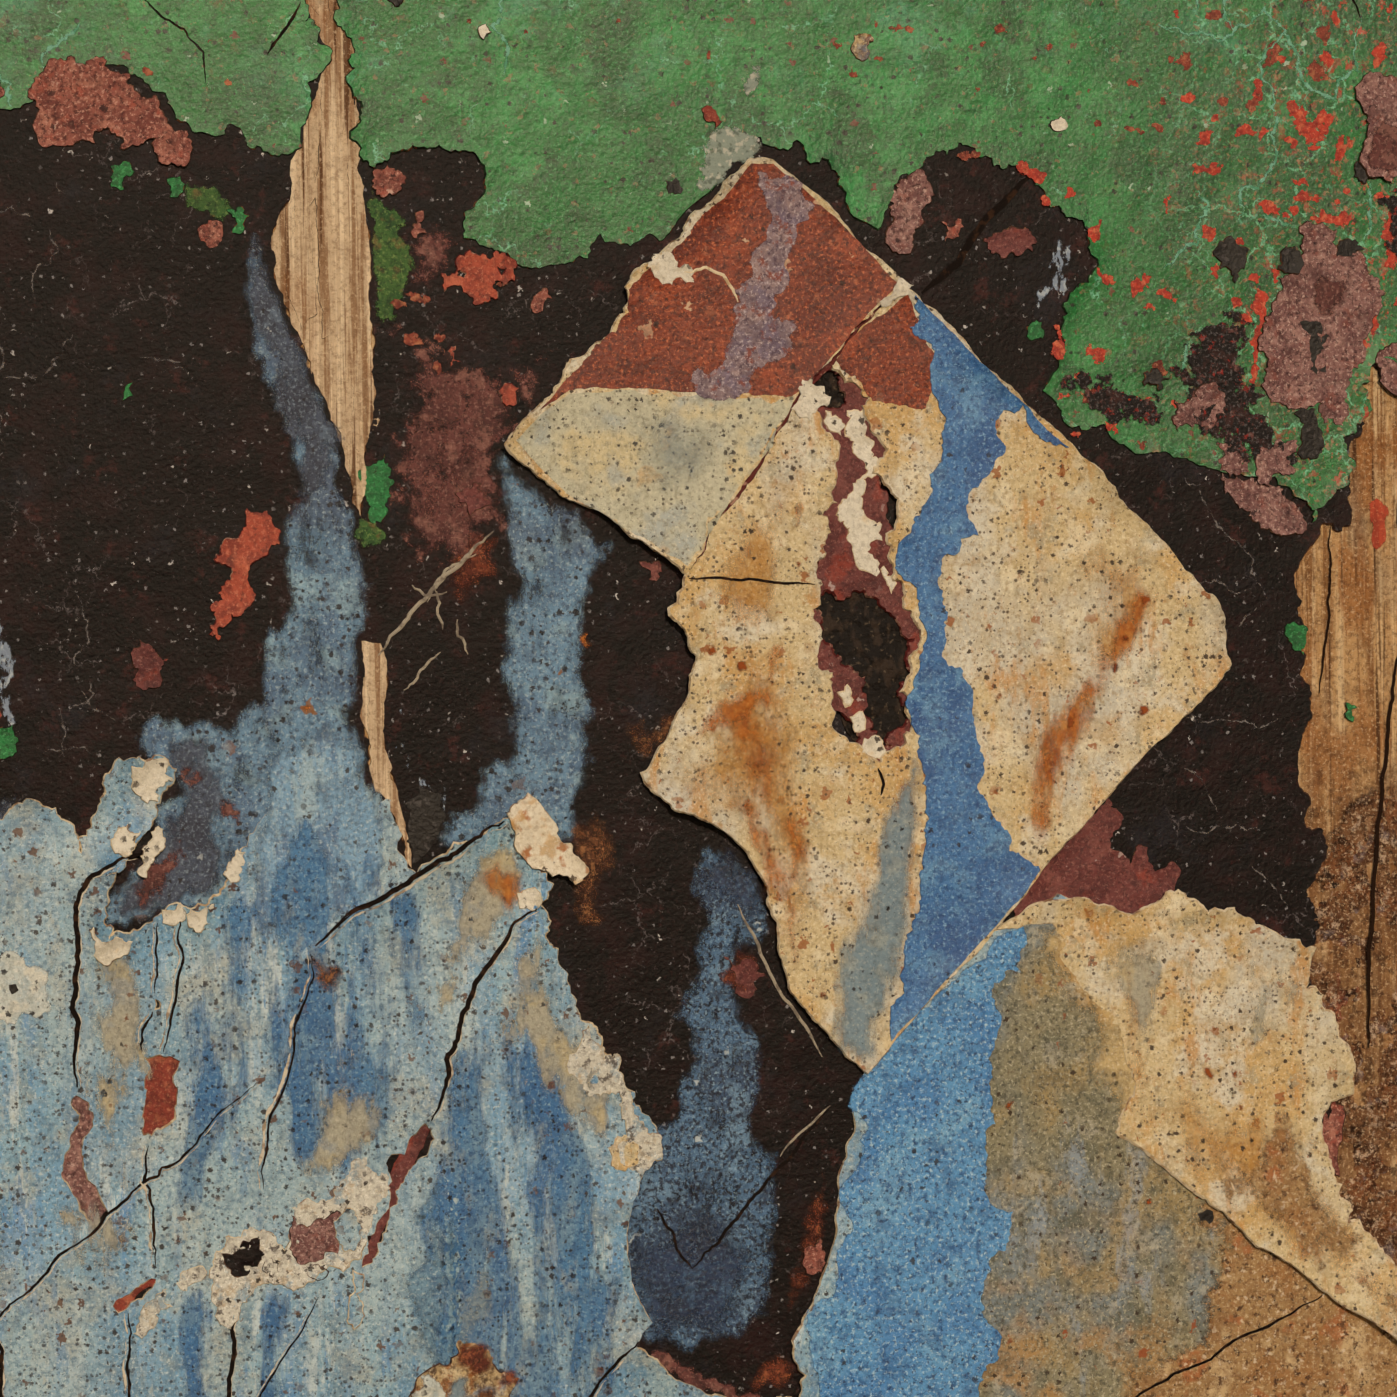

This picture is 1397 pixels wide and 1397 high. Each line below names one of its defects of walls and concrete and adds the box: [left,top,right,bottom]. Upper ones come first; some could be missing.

peeling [957,150,981,161]
peeling [1124,123,1164,135]
crack [1159,0,1362,268]
crack [693,305,881,565]
peeling [0,725,19,759]
peeling [90,927,133,966]
crack [0,821,507,1397]
crack [431,909,539,1121]
crack [657,1106,831,1269]
peeling [106,157,1397,1349]
crack [1367,658,1397,1048]
peeling [651,1350,760,1397]